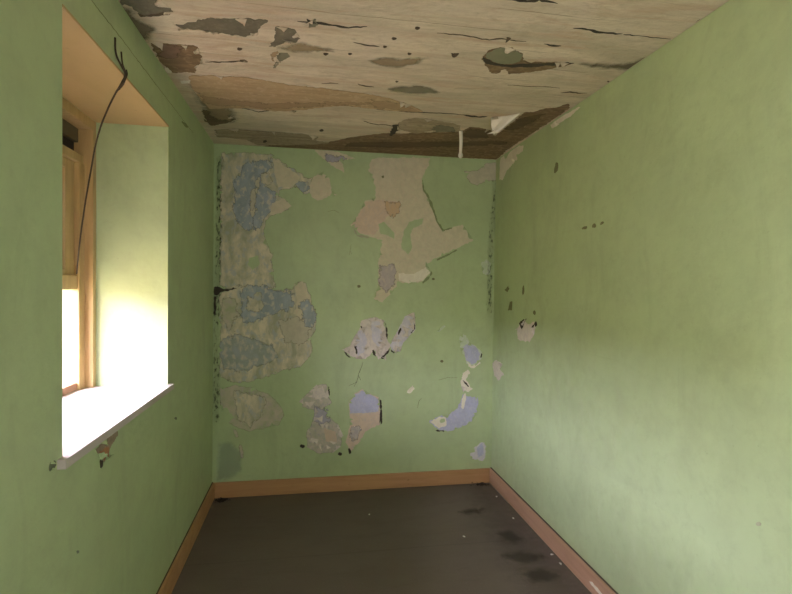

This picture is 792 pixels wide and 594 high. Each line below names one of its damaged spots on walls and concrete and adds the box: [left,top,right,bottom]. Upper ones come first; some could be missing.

peeling [120,0,173,17]
peeling [173,17,300,68]
peeling [151,43,580,432]
peeling [299,384,382,456]
flaking render [96,431,118,468]